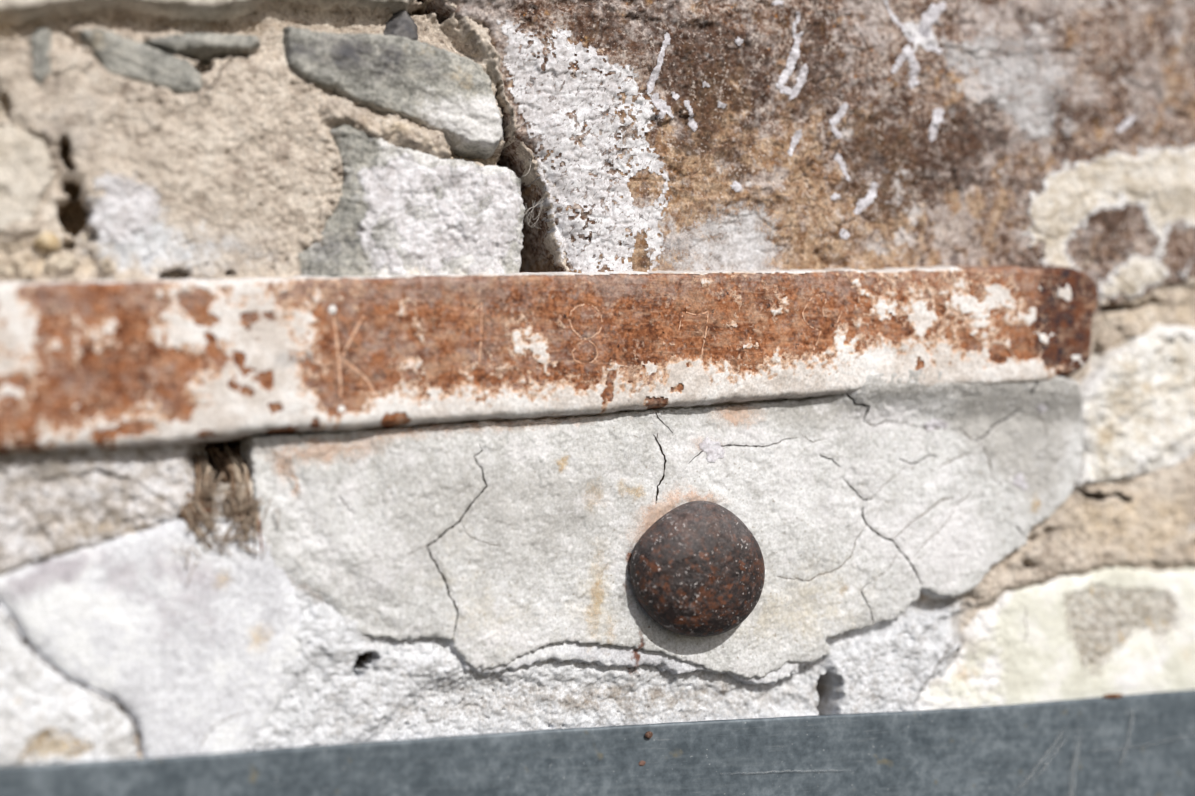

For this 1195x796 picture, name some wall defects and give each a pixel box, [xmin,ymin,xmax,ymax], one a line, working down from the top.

crack [251,429,330,437]
rust [723,406,749,425]
rust [644,494,709,531]
crack [653,382,1047,623]
crack [408,444,500,633]